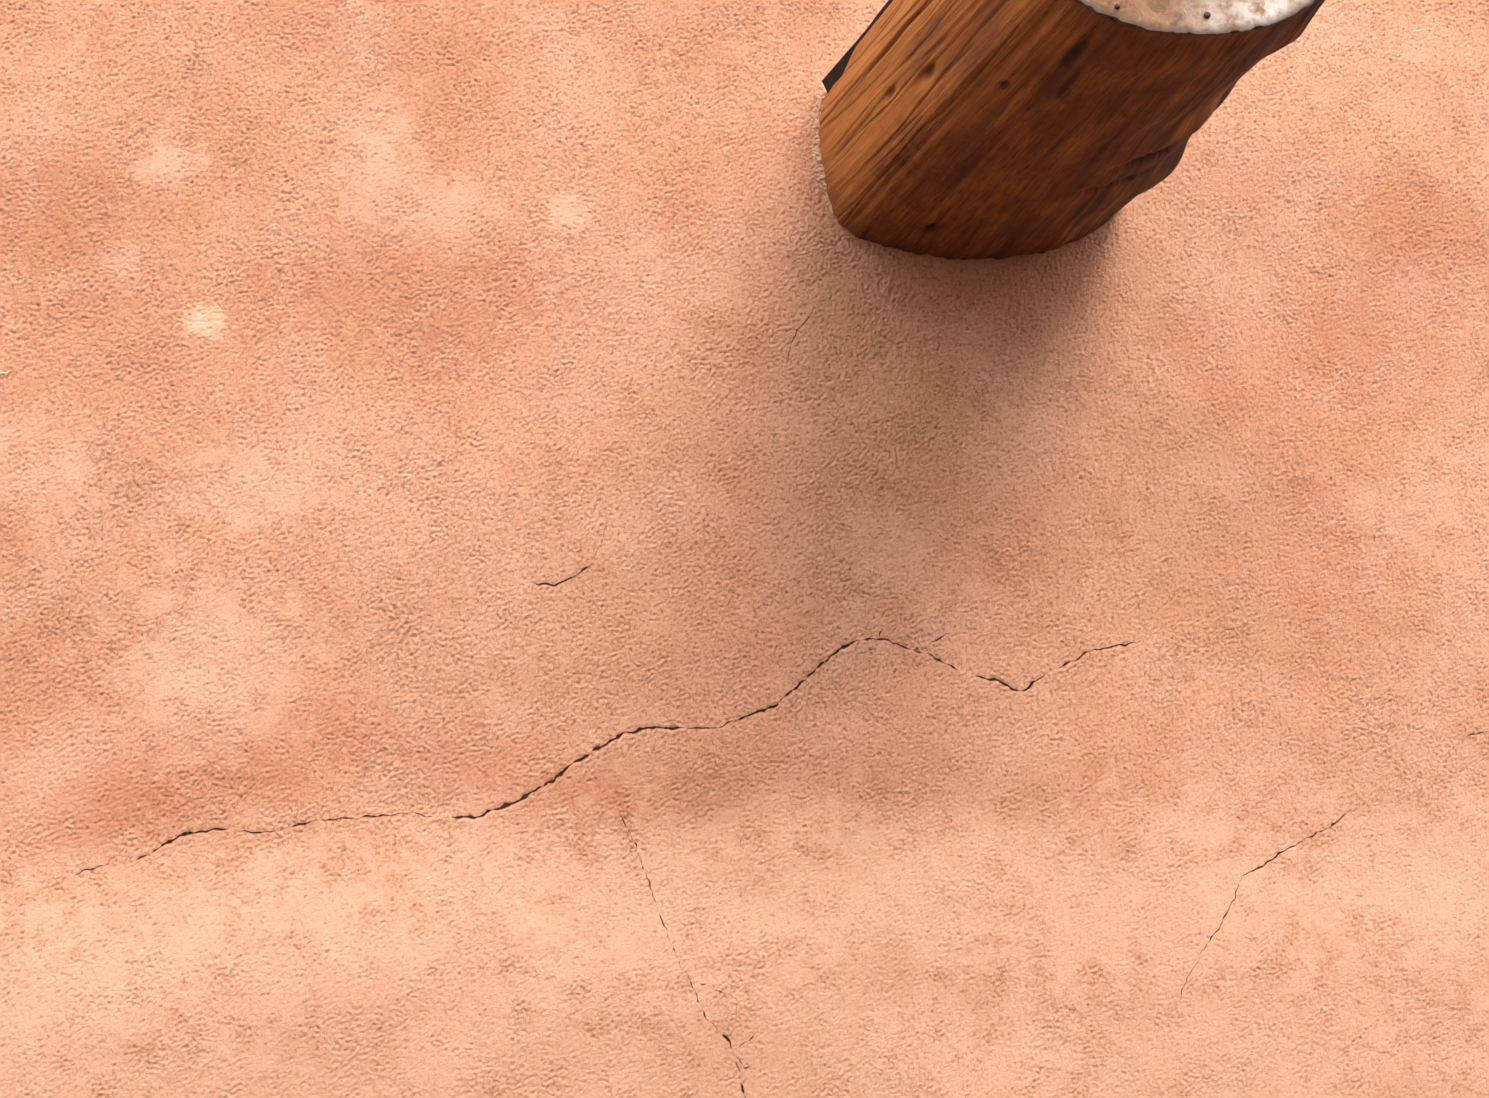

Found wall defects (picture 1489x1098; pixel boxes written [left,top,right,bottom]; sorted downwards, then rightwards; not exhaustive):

crack [78,629,1140,874]